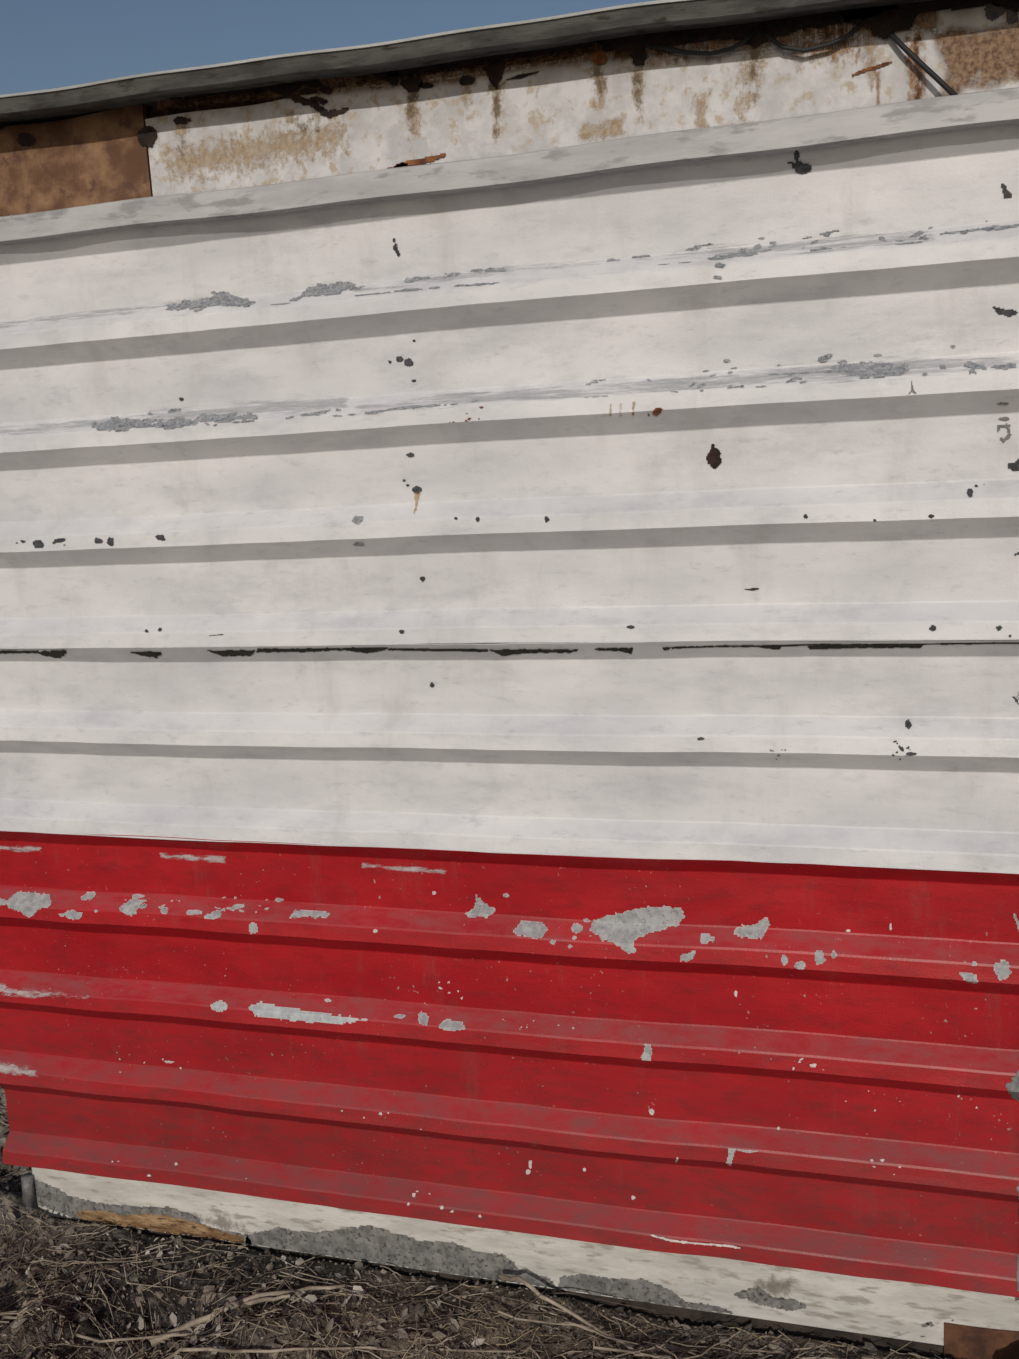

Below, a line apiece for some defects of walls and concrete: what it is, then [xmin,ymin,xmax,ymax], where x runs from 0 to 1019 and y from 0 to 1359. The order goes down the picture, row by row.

rust [155,0,1019,182]
peeling [607,220,1019,279]
peeling [271,268,507,305]
peeling [43,291,255,321]
peeling [5,345,1016,432]
peeling [0,890,98,920]
peeling [119,894,330,934]
peeling [465,893,509,918]
peeling [513,905,685,954]
peeling [210,1000,228,1012]
peeling [248,998,368,1025]